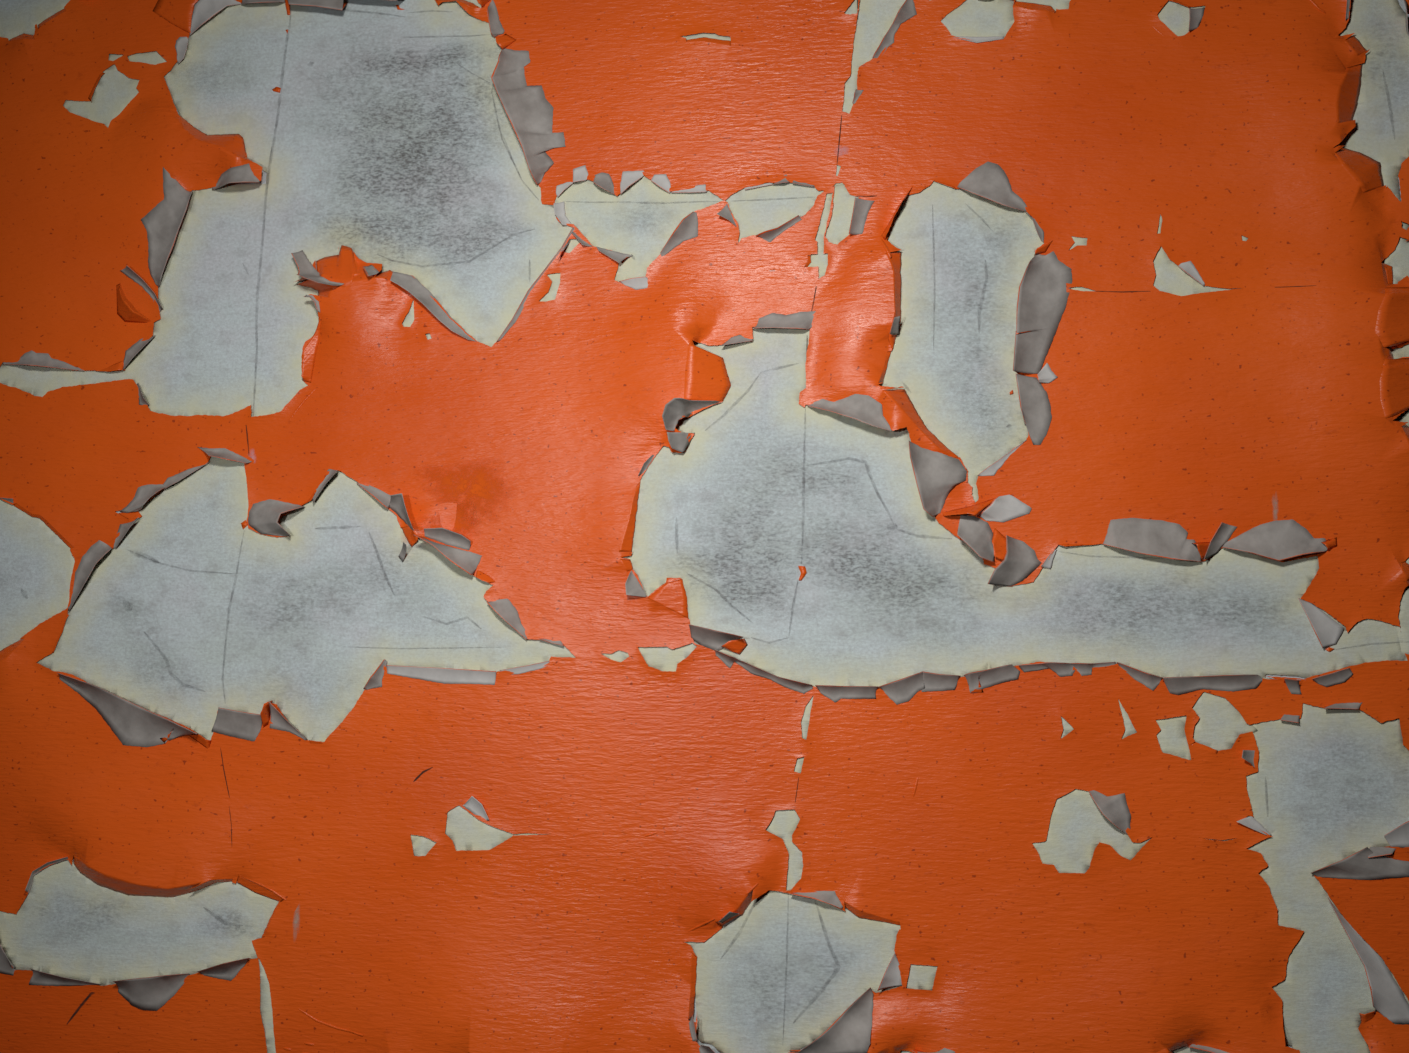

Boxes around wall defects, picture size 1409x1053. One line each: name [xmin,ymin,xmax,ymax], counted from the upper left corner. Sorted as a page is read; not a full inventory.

peeling [842,0,917,114]
peeling [941,0,1070,43]
peeling [1333,0,1409,201]
peeling [0,0,874,417]
peeling [0,447,576,748]
peeling [602,162,1409,1053]
peeling [411,796,546,856]
peeling [0,855,284,1053]